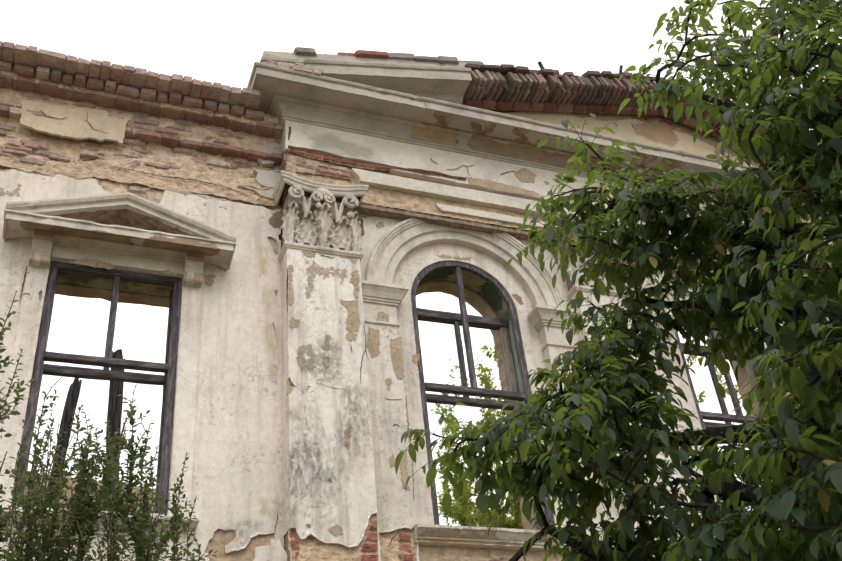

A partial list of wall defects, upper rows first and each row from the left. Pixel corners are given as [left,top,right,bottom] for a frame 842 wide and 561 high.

flaking render [0,68,548,255]
flaking render [411,97,687,176]
peeling [302,250,389,358]
peeling [296,335,331,371]
peeling [385,337,420,391]
flaking render [205,530,275,561]
flaking render [288,514,520,561]